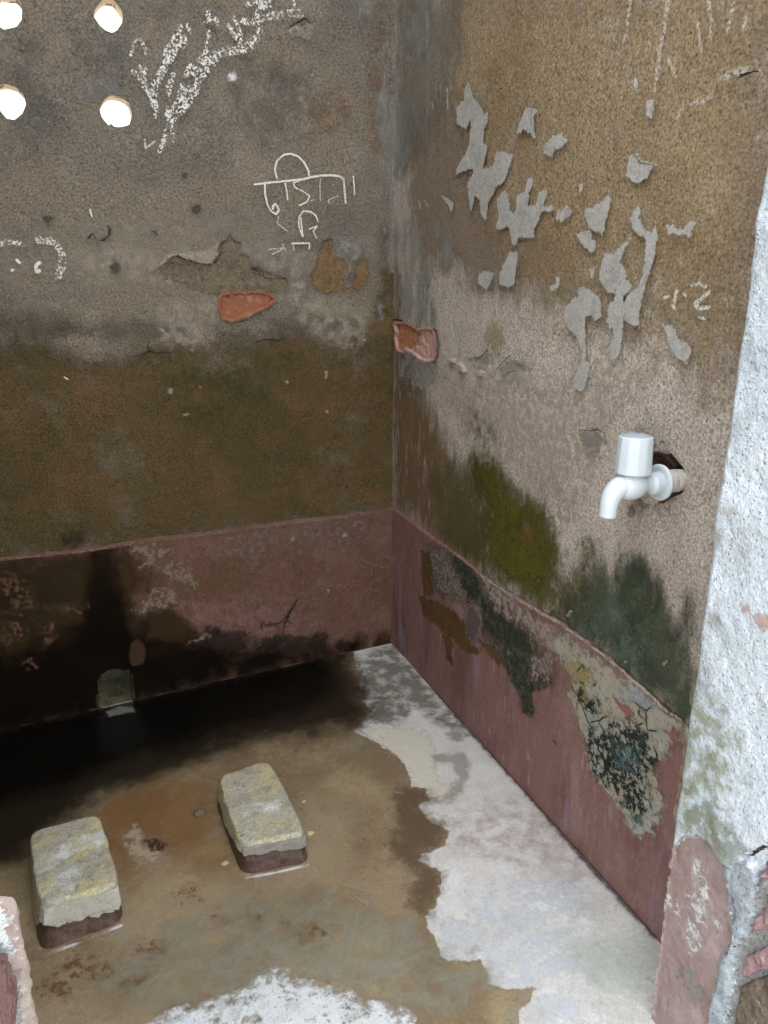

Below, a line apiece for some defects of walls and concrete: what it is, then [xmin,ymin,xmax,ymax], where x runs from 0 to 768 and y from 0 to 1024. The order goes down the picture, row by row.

flaking render [159,234,290,323]
flaking render [311,238,370,294]
leakage [0,0,768,723]
flaking render [377,304,526,390]
flaking render [456,81,697,391]
crack [258,598,299,647]
leakage [0,555,536,1024]
flaking render [531,634,685,840]
leakage [570,681,658,826]